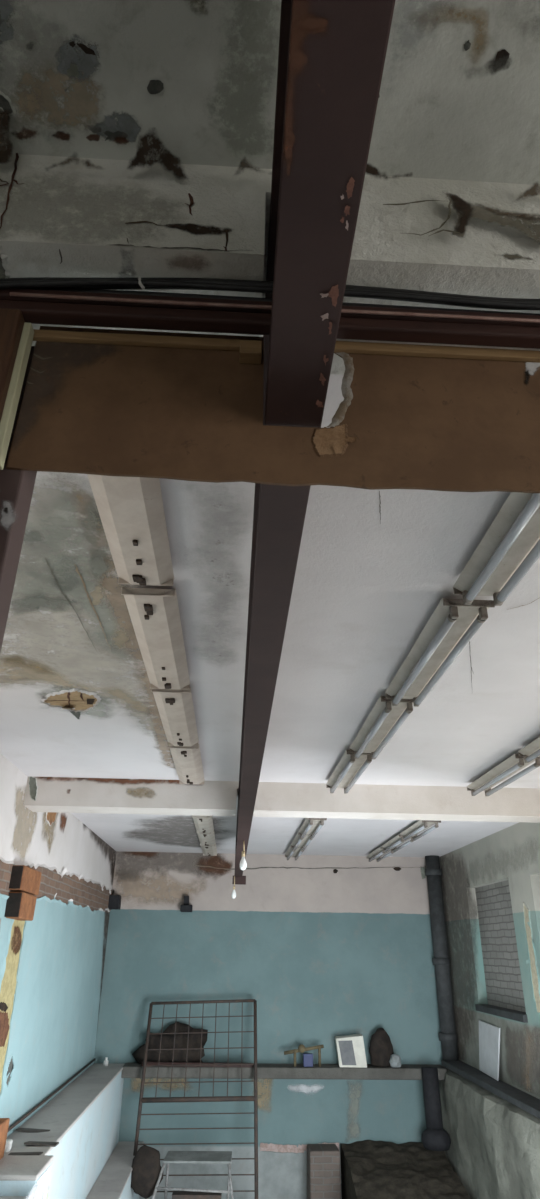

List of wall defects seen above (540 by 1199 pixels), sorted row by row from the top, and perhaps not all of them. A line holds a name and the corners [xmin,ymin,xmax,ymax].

spalling [147,80,164,94]
corrosion [283,0,328,176]
spalling [89,112,141,142]
crack [0,153,24,228]
crack [185,193,194,215]
crack [114,238,248,251]
leakage [0,483,174,768]
spalling [40,688,101,719]
spalling [28,776,39,801]
peeling [46,812,57,826]
leakage [84,817,231,902]
spalling [0,857,114,914]